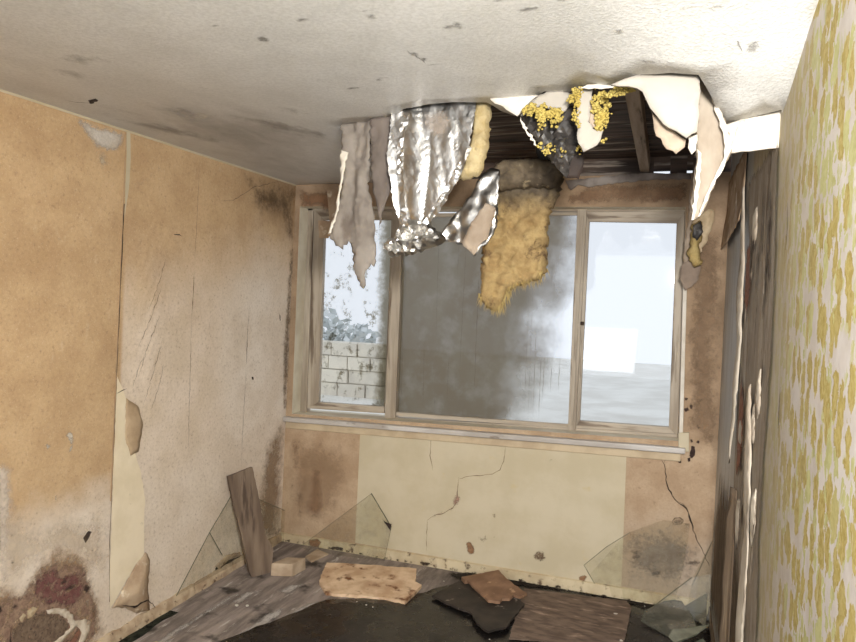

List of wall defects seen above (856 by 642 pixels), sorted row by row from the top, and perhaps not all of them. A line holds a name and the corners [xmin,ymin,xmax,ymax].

flaking render [491,95,538,117]
peeling [688,135,698,155]
flaking render [744,206,758,320]
leakage [678,239,717,463]
flaking render [736,369,761,475]
leakage [0,528,98,642]
flaking render [109,377,145,608]
leakage [119,610,178,642]
crack [426,455,505,550]
leakage [508,579,655,609]
crack [662,461,709,564]
leakage [710,483,738,642]